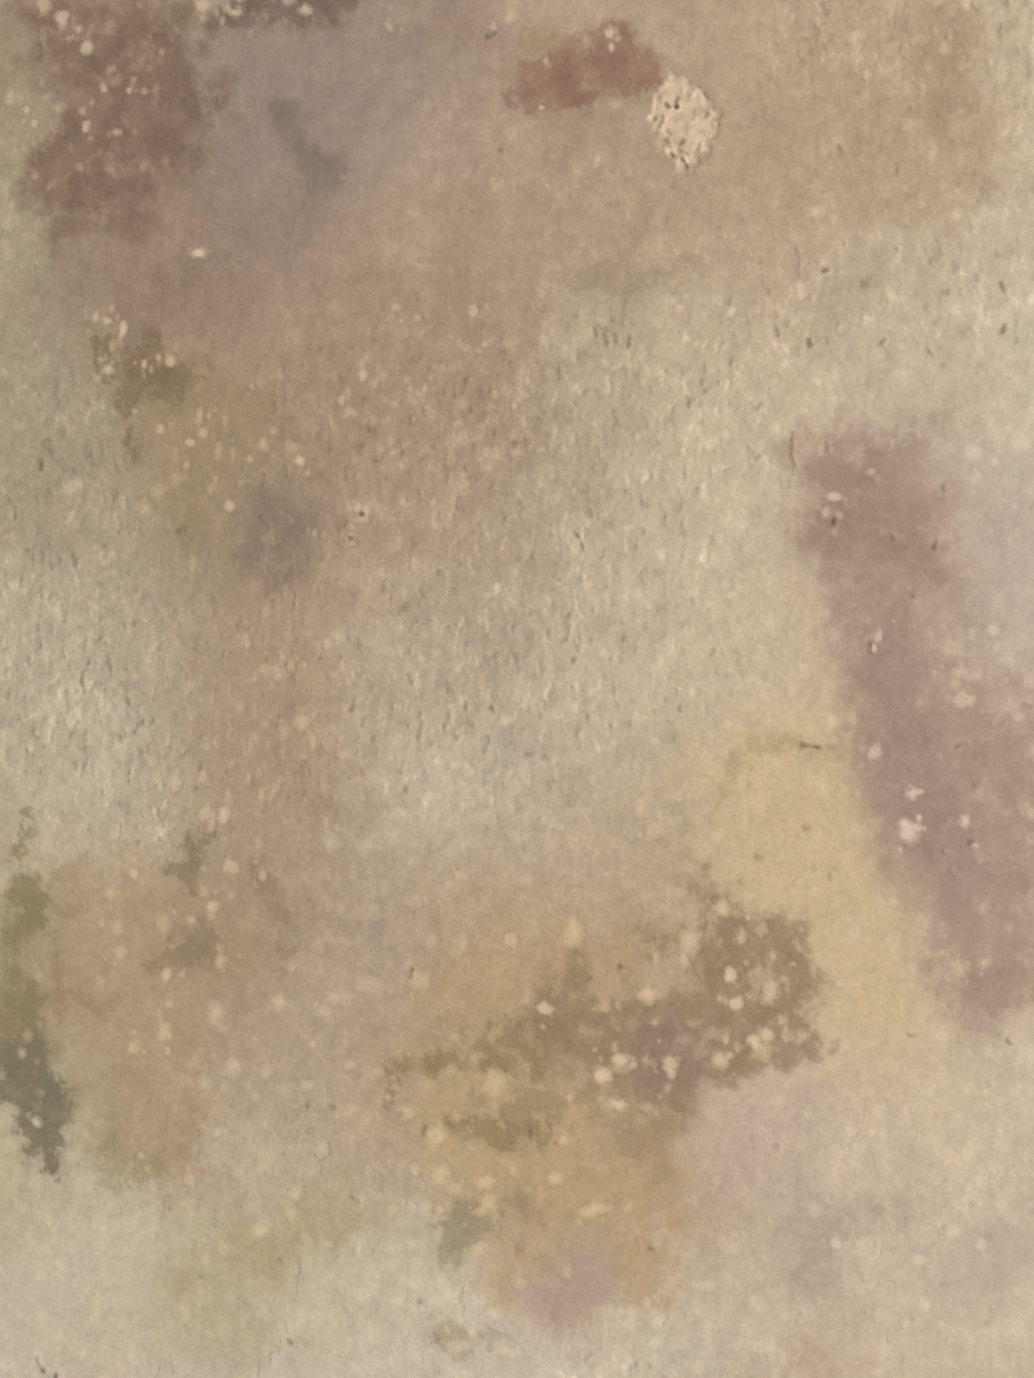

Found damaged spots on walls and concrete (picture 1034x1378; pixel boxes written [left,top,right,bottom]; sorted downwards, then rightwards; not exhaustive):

water stain [0,0,518,344]
corrosion [480,1,695,140]
water stain [646,69,722,177]
water stain [34,461,418,1158]
water stain [350,360,1034,1378]